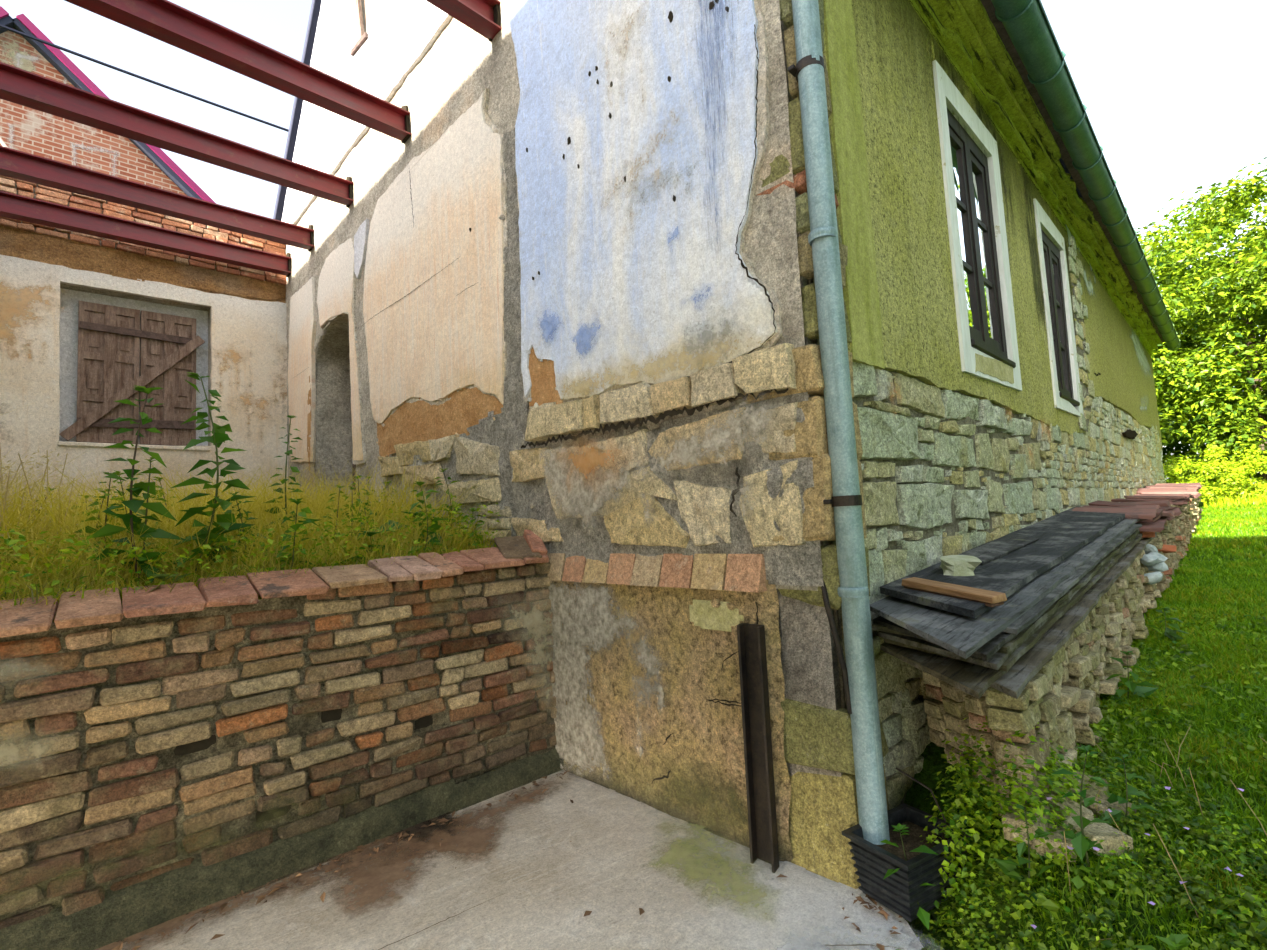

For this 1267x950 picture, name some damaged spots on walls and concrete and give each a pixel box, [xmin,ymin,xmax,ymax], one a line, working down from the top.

spalling [376,127,563,457]
peeling [576,323,600,354]
damp [1024,175,1045,324]
damp [95,782,562,950]